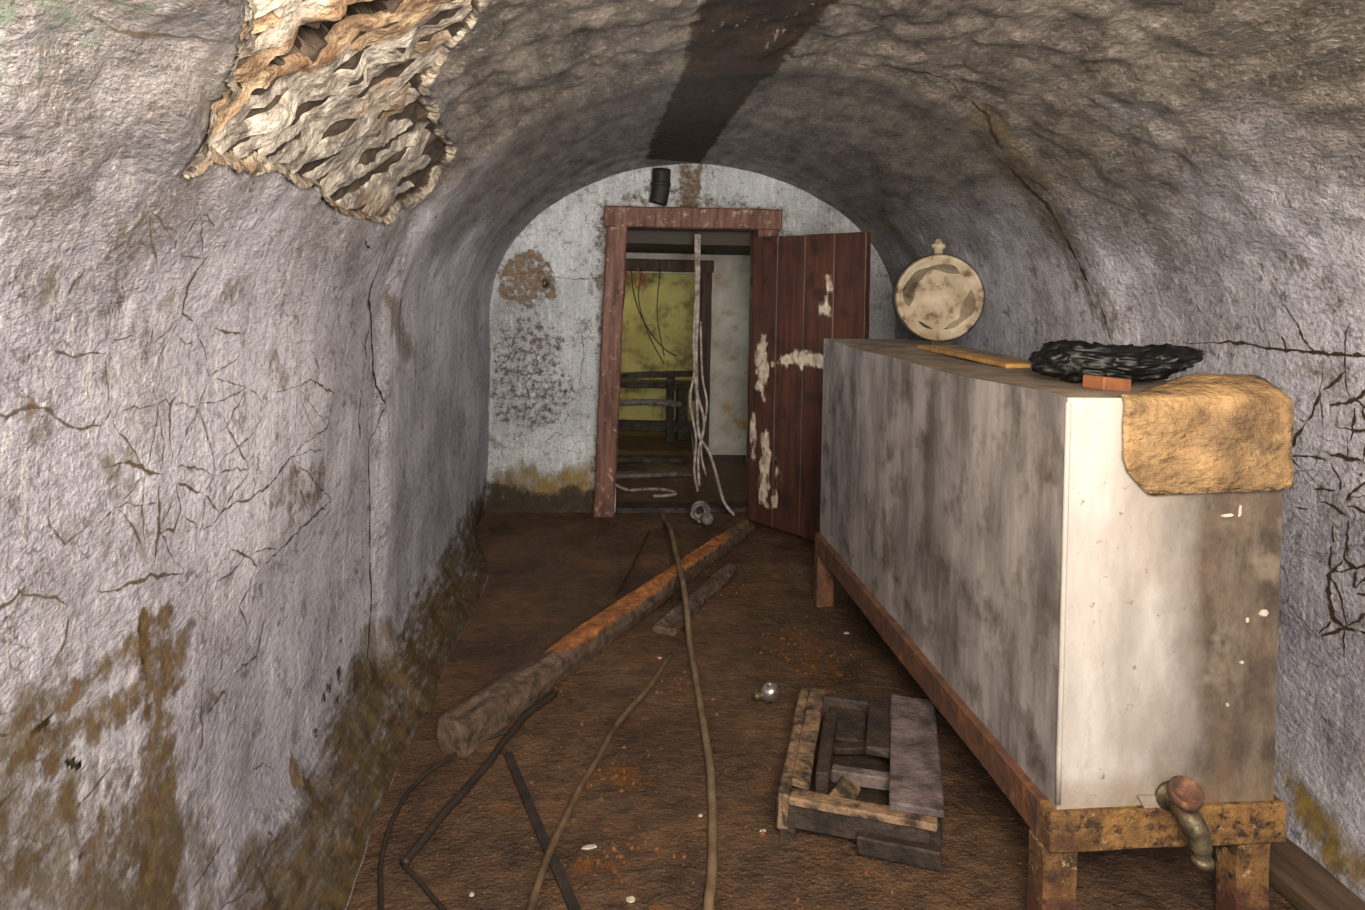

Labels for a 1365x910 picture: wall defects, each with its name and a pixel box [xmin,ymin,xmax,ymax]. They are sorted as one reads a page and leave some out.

spalling [181,0,491,225]
water stain [491,249,573,431]
crack [0,211,396,772]
crack [1183,289,1365,654]
crack [0,785,20,806]
crack [83,767,111,800]
water stain [0,604,212,910]
crack [195,842,223,886]
crack [221,828,283,909]